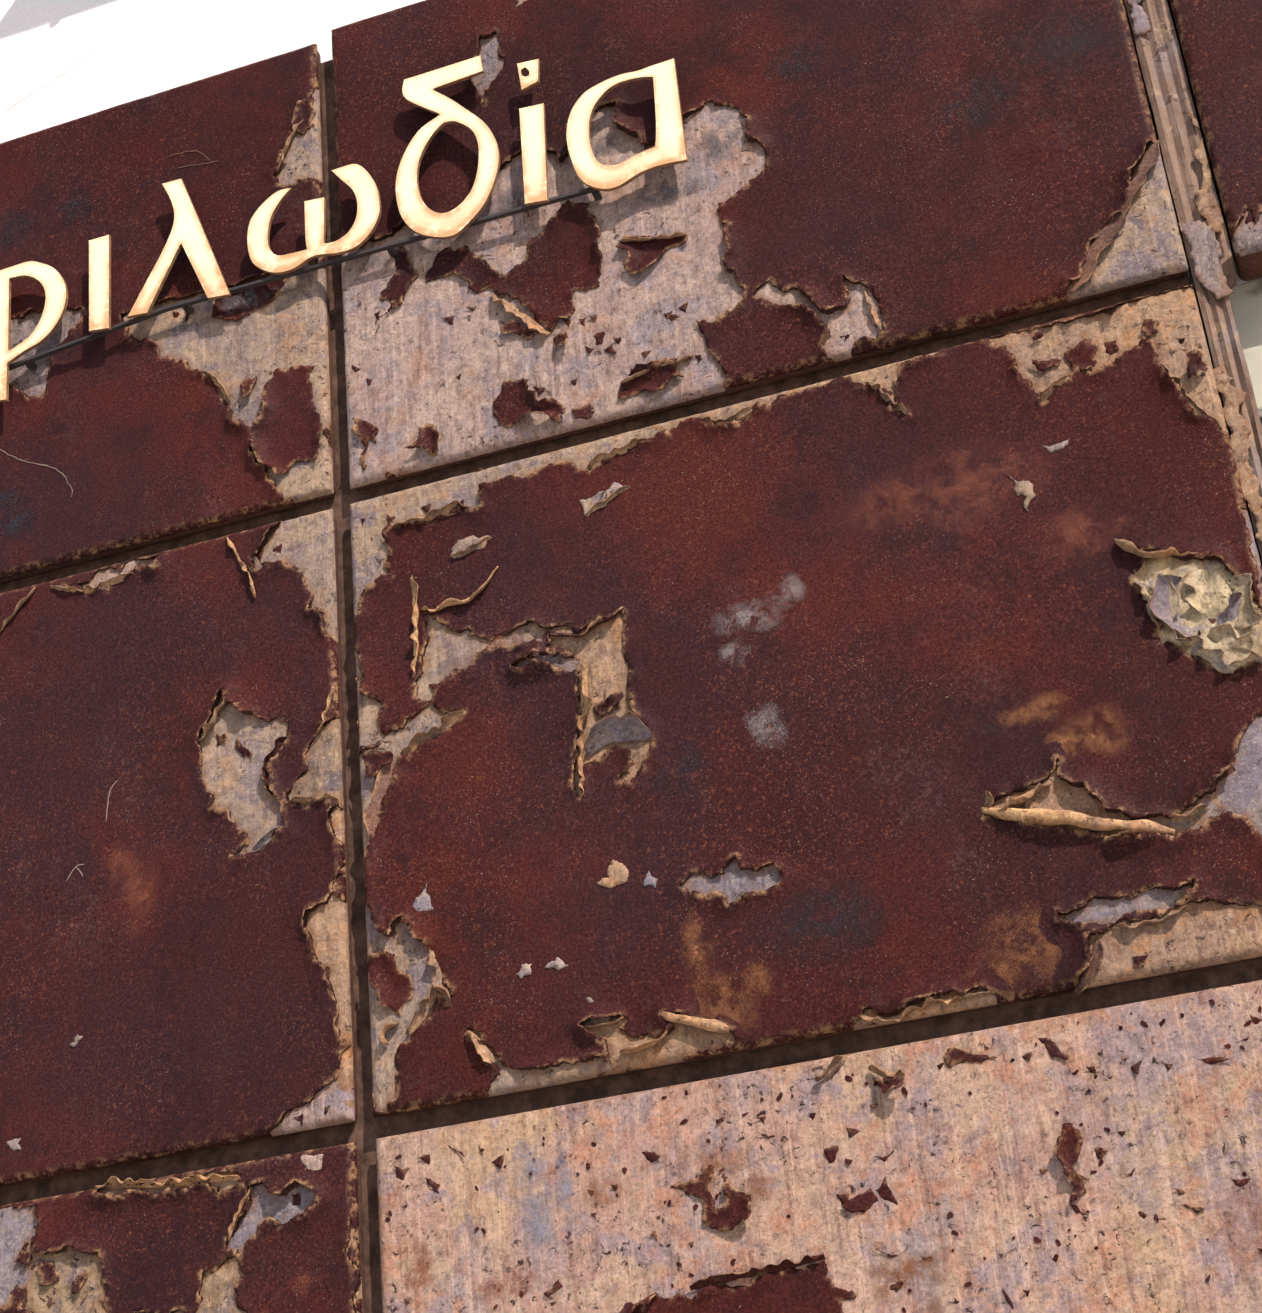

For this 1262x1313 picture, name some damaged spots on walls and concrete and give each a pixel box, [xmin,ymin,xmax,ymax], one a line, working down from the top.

peeling [123,89,911,643]
peeling [991,111,1262,674]
peeling [198,686,345,855]
peeling [356,566,652,853]
rust [1053,712,1118,753]
peeling [981,716,1262,837]
peeling [270,893,355,1136]
peeling [366,905,451,1112]
peeling [1058,882,1262,995]
peeling [0,1205,108,1313]
peeling [95,1171,316,1313]
peeling [376,980,1262,1313]